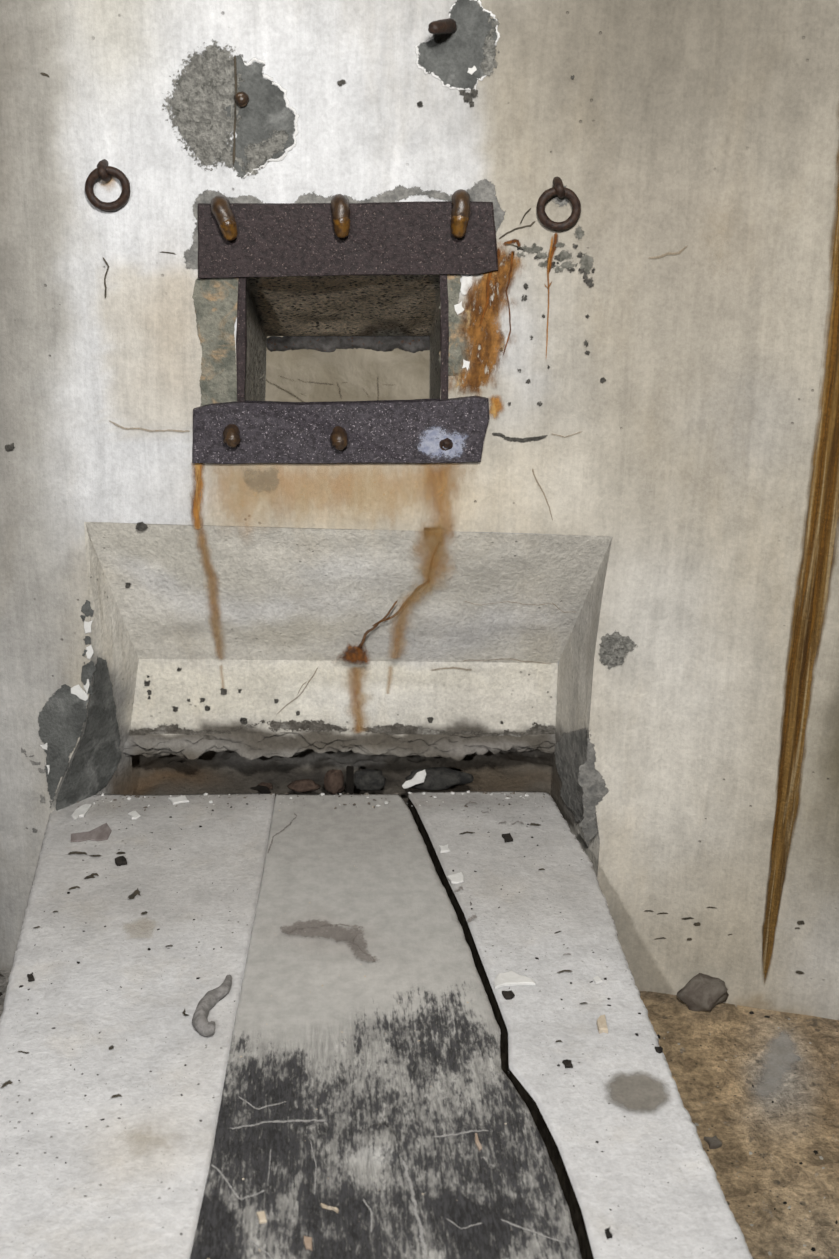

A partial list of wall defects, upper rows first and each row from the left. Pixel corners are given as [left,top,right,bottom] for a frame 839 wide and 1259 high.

spalling [162,39,299,179]
spalling [415,0,500,107]
rust [450,239,520,418]
rust [192,463,220,654]
spalling [21,600,608,842]
rust [338,472,449,703]
spalling [599,632,638,669]
leakage [281,920,376,962]
crack [408,797,594,1259]
leakage [608,1074,668,1111]